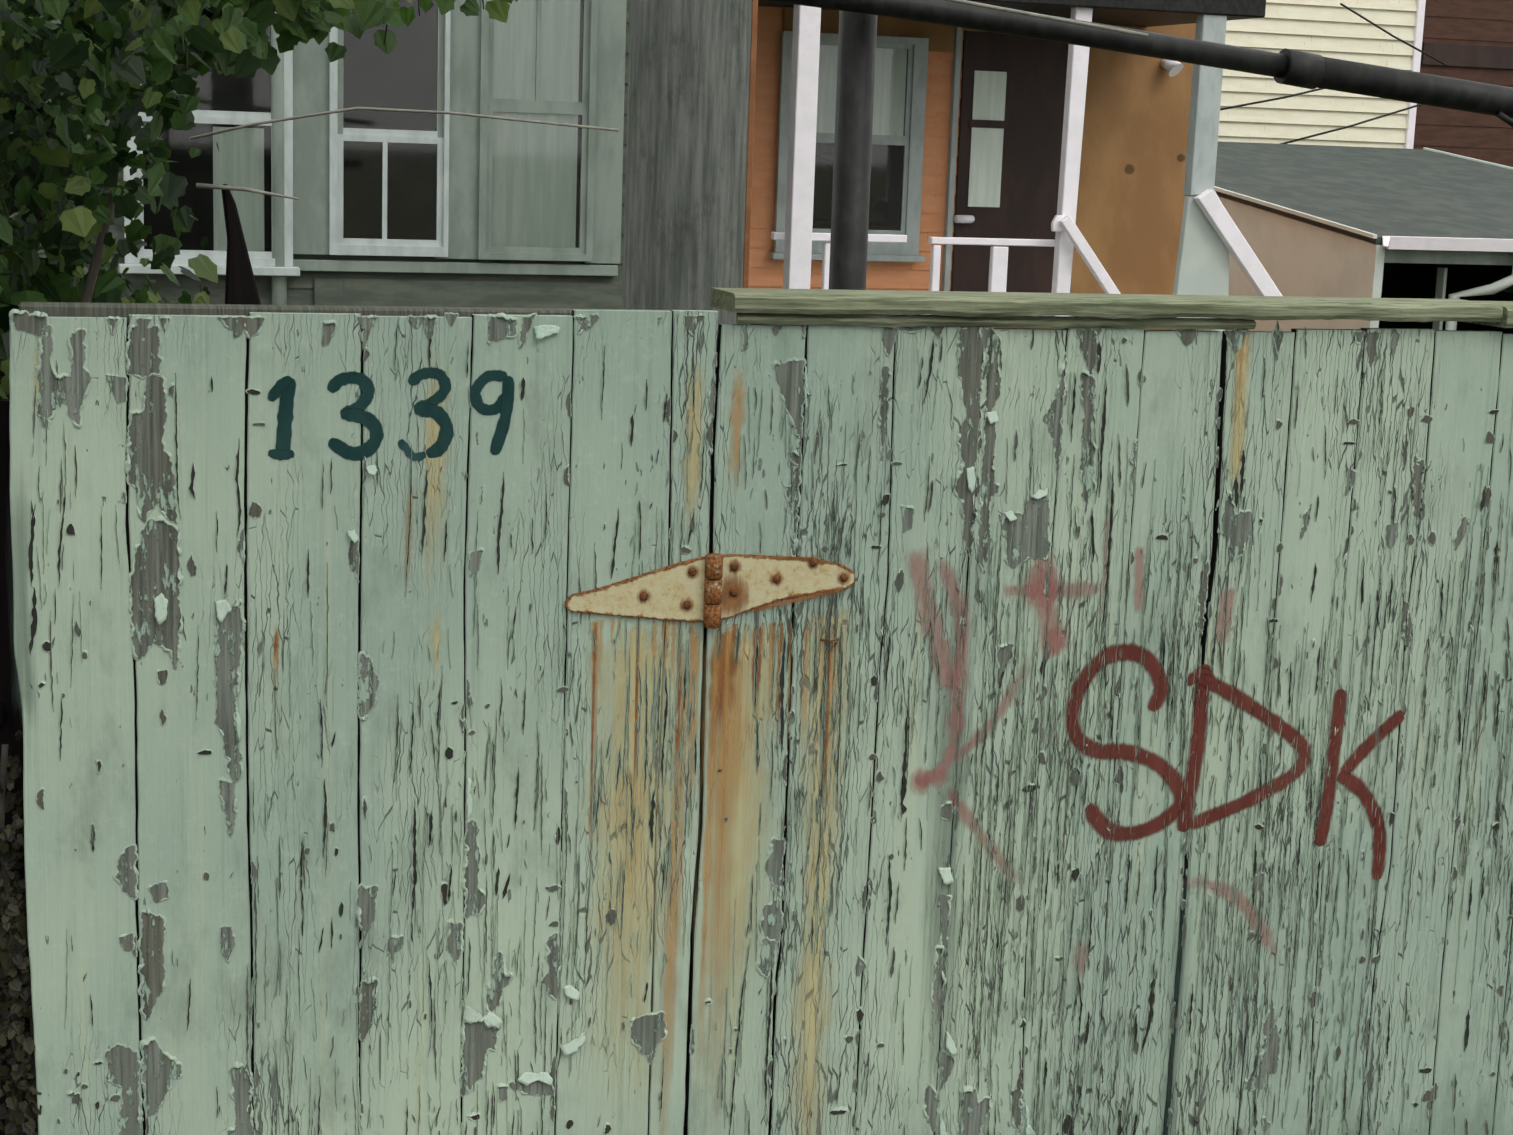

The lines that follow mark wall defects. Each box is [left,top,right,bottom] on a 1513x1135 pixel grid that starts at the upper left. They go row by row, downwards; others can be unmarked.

peeling [9,309,198,686]
peeling [771,357,810,549]
peeling [877,326,1102,574]
peeling [197,598,246,839]
corrosion [591,556,849,1087]
peeling [56,844,184,1135]
peeling [226,1061,256,1135]
peeling [458,951,555,1121]
peeling [629,1011,668,1065]